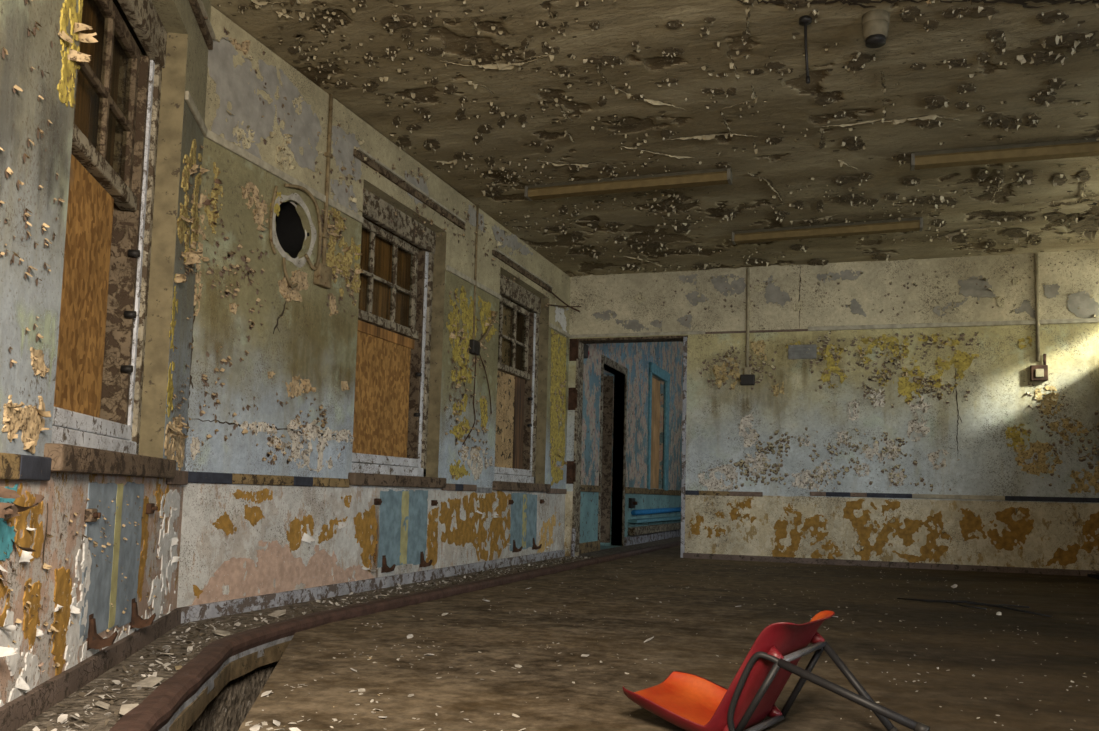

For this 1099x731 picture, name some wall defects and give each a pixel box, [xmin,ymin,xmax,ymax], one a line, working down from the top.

peeling [30,0,98,107]
peeling [0,167,65,286]
peeling [164,0,1099,495]
peeling [25,316,49,377]
peeling [0,395,51,454]
peeling [33,285,588,731]
peeling [772,499,1034,563]
peeling [1043,511,1099,566]
peeling [0,482,180,707]